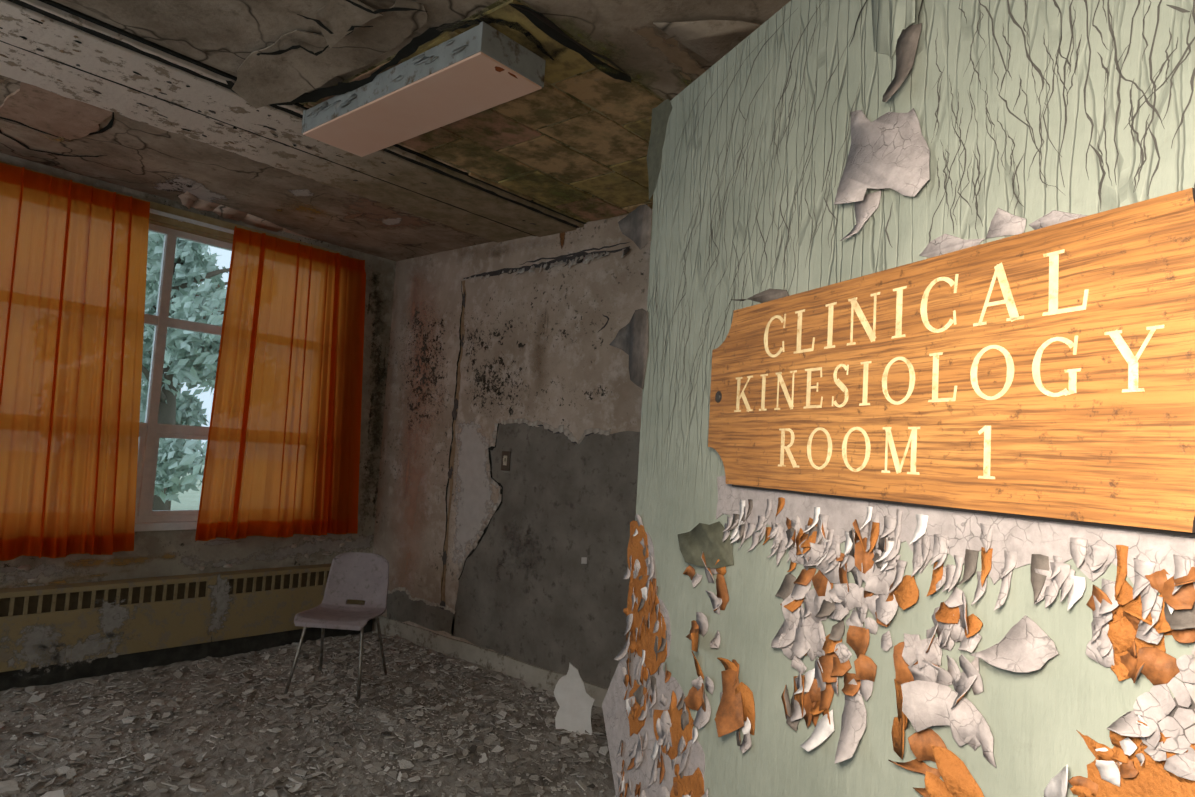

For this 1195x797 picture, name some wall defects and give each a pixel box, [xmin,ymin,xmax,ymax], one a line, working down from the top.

crack [0,112,114,157]
spalling [232,0,673,250]
peeling [834,0,930,241]
crack [918,0,1195,242]
leakage [405,302,445,430]
peeling [609,309,648,389]
crack [647,0,867,442]
peeling [730,289,789,303]
crack [885,202,893,247]
peeling [919,208,1088,258]
peeling [0,597,137,672]
spalling [387,418,1195,797]